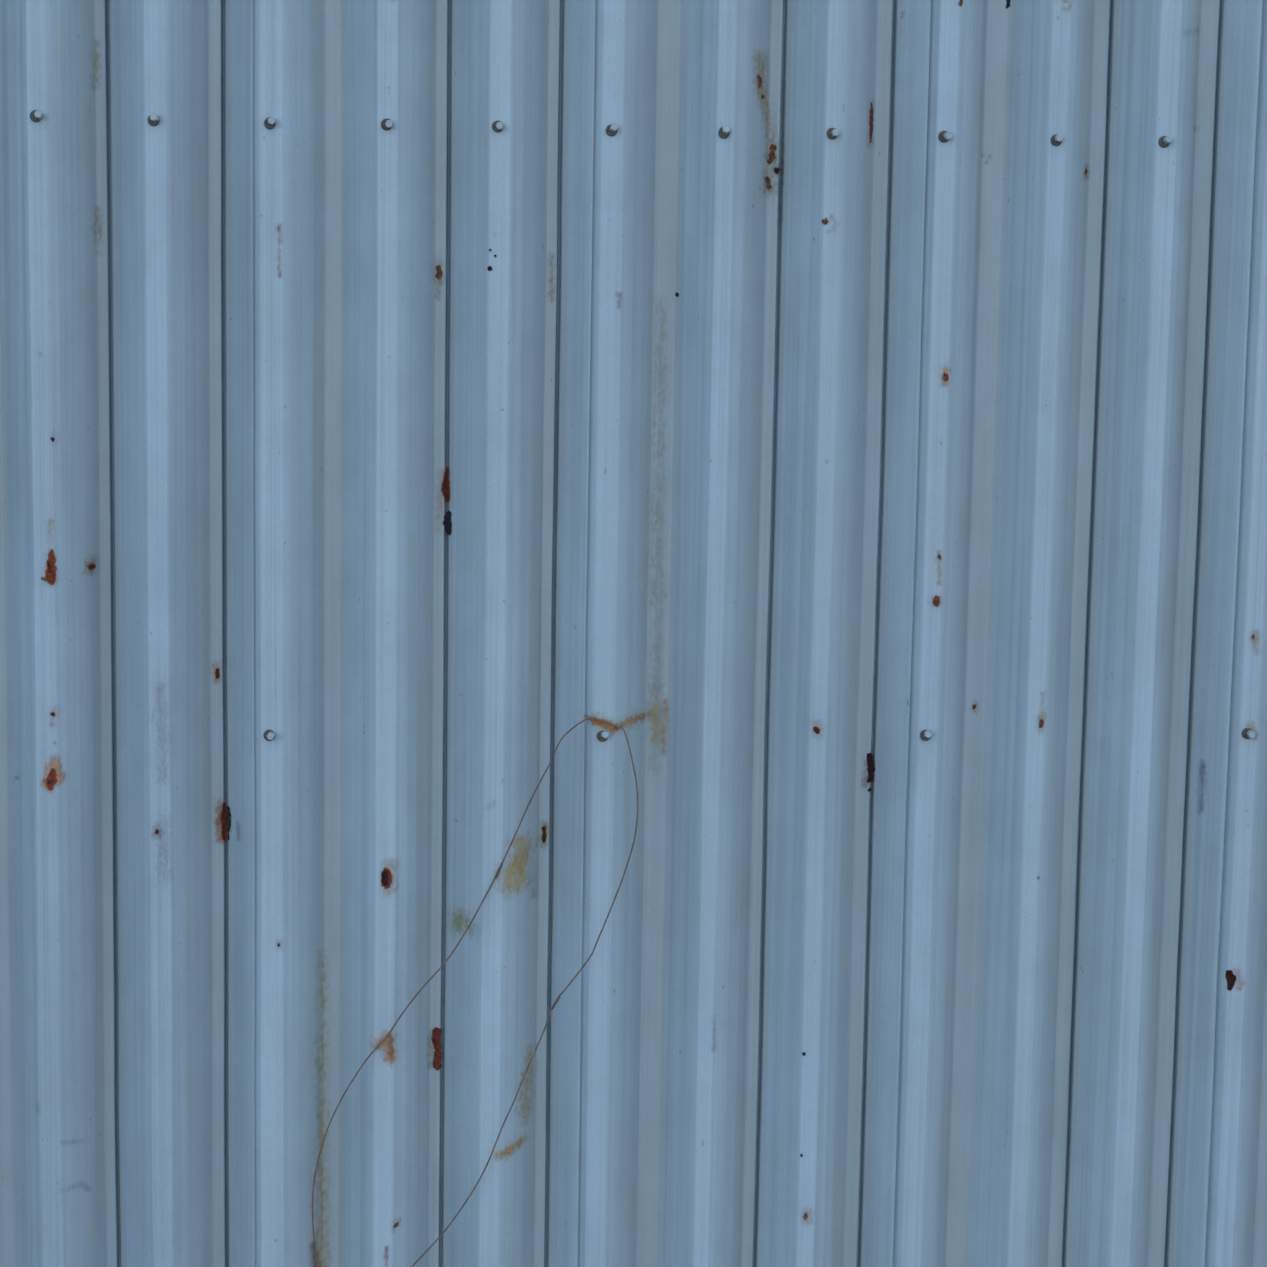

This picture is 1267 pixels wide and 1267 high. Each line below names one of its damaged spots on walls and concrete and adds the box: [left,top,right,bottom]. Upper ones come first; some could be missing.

rust [758,55,767,109]
rust [765,139,780,189]
rust [441,466,452,535]
rust [41,550,57,585]
rust [590,702,667,743]
rust [43,758,64,791]
rust [216,802,231,841]
rust [381,868,393,889]
rust [1225,970,1241,991]
rust [431,1027,442,1070]